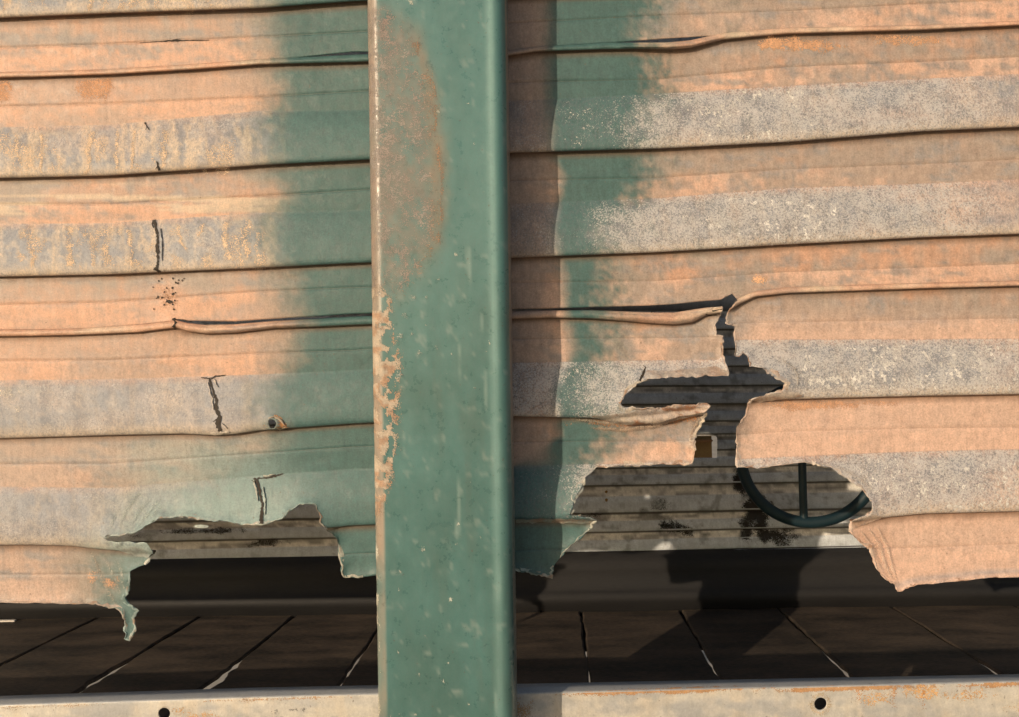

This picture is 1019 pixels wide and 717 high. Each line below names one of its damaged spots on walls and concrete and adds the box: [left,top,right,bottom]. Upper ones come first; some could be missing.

corrosion [367,4,445,306]
crack [151,220,163,274]
peeling [799,344,1019,392]
crack [201,375,229,435]
peeling [372,283,413,559]
crack [251,473,283,524]
peeling [855,456,1019,510]